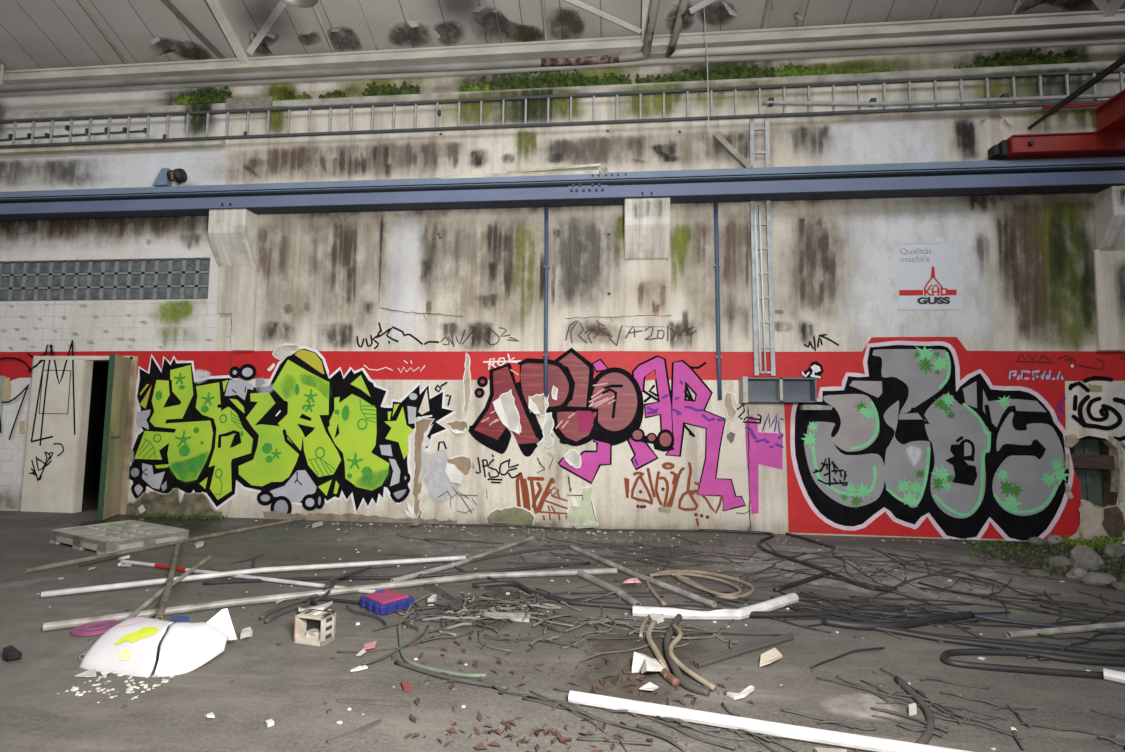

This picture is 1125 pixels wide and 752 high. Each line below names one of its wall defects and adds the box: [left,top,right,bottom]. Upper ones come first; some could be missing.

water stain [233,143,458,177]
water stain [504,134,688,162]
water stain [956,115,1011,156]
water stain [332,223,383,301]
water stain [457,226,519,306]
water stain [539,224,600,298]
water stain [799,219,836,305]
water stain [471,323,490,346]
peeling [493,385,581,468]
peeling [485,506,536,526]
peeling [567,486,598,526]
spalling [1064,434,1125,541]